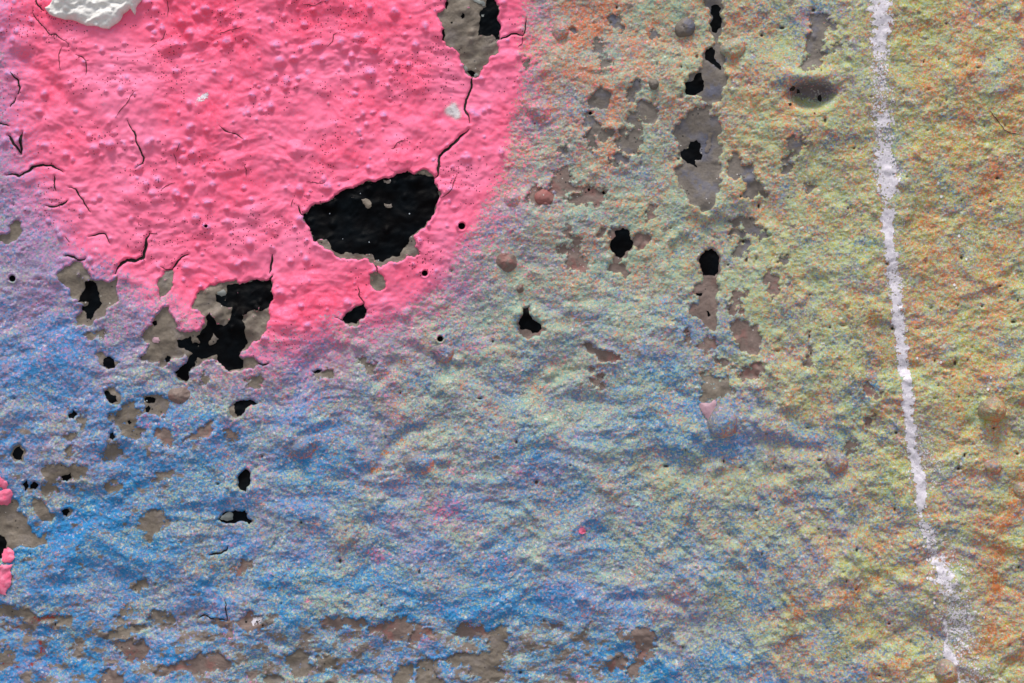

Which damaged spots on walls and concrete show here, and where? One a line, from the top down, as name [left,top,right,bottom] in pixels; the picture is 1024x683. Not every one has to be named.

crack [32,0,87,73]
peeling [437,0,501,78]
peeling [57,261,119,341]
crack [0,72,188,274]
peeling [100,269,273,462]
peeling [303,169,441,291]
crack [435,77,473,198]
peeling [596,204,658,279]
peeling [673,0,769,212]
peeling [683,216,770,419]
peeling [0,410,88,626]
peeling [392,622,511,683]